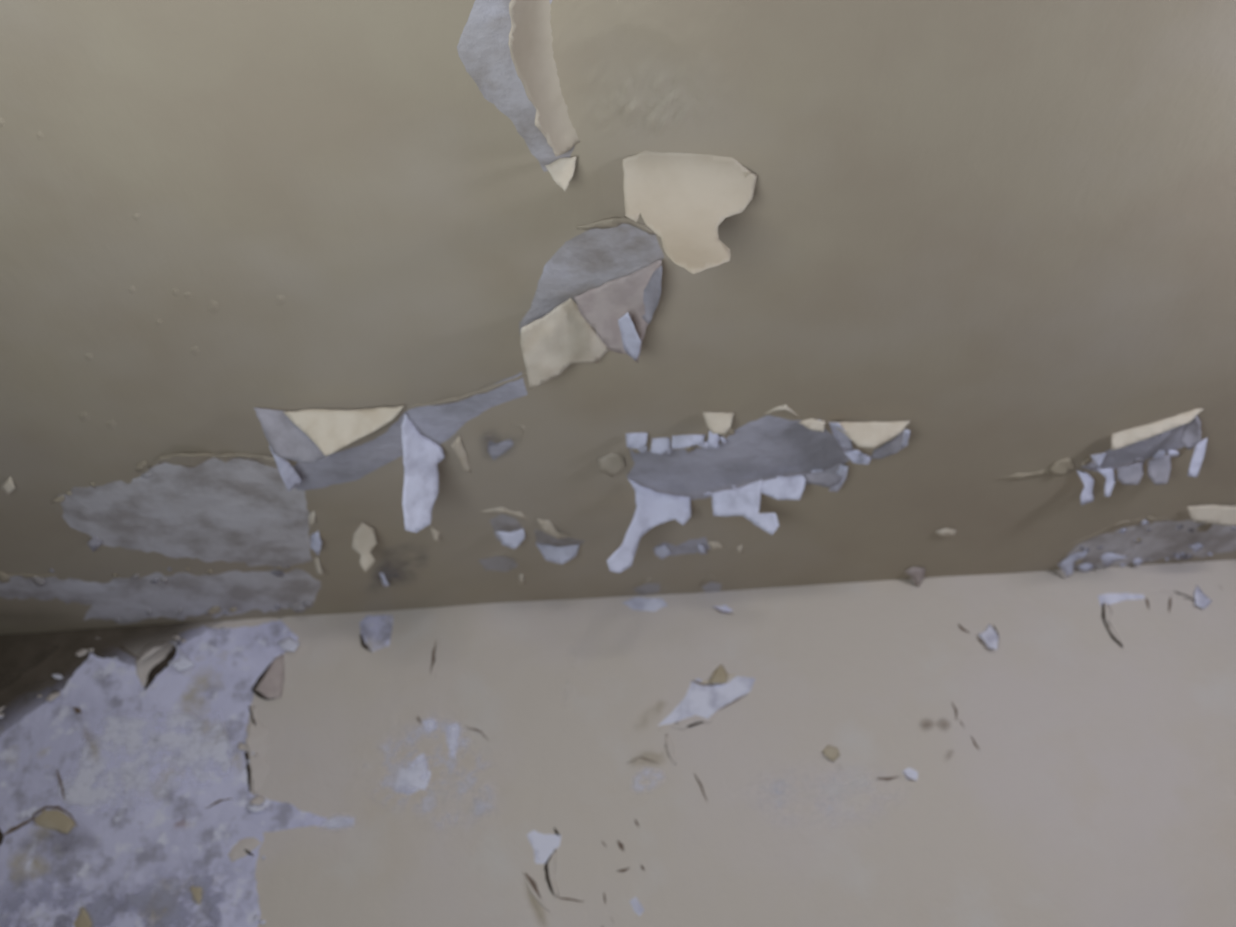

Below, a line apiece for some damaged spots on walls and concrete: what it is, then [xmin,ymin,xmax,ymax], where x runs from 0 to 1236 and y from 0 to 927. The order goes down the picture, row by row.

peeling [457,0,581,191]
peeling [0,151,757,927]
peeling [597,405,910,573]
peeling [995,409,1207,505]
peeling [1057,505,1236,577]